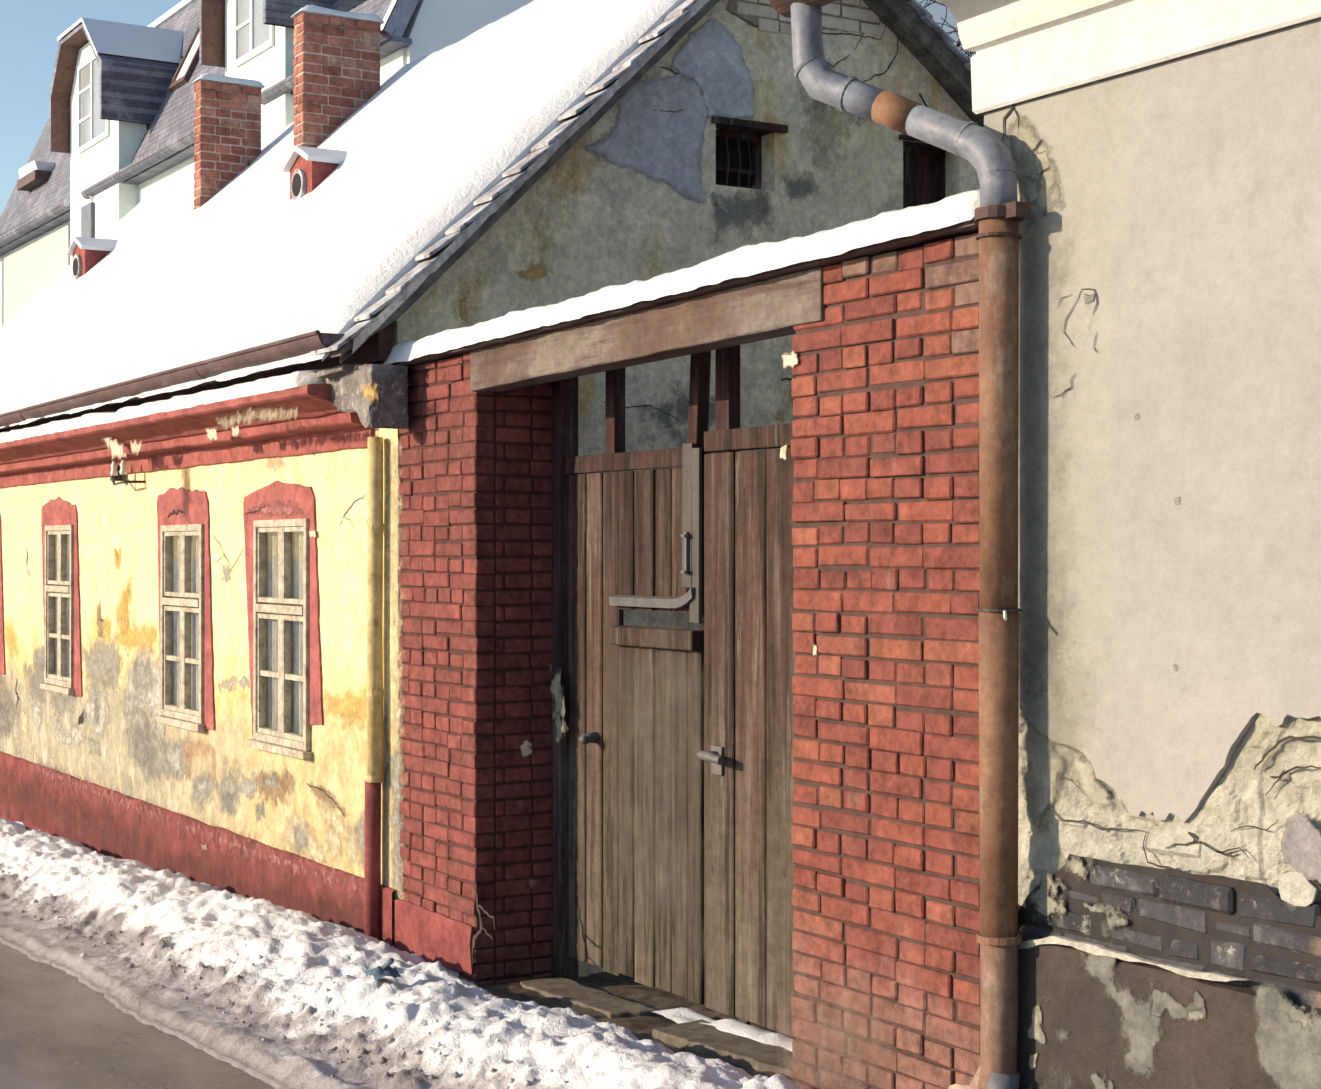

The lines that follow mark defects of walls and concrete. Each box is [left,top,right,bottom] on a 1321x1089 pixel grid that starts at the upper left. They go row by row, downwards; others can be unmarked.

flaking render [725,0,792,35]
flaking render [822,0,897,40]
crack [827,22,899,82]
peeling [1007,116,1064,216]
peeling [206,407,298,440]
peeling [21,580,166,754]
peeling [549,665,568,743]
peeling [34,762,364,899]
spalling [1018,709,1321,1089]